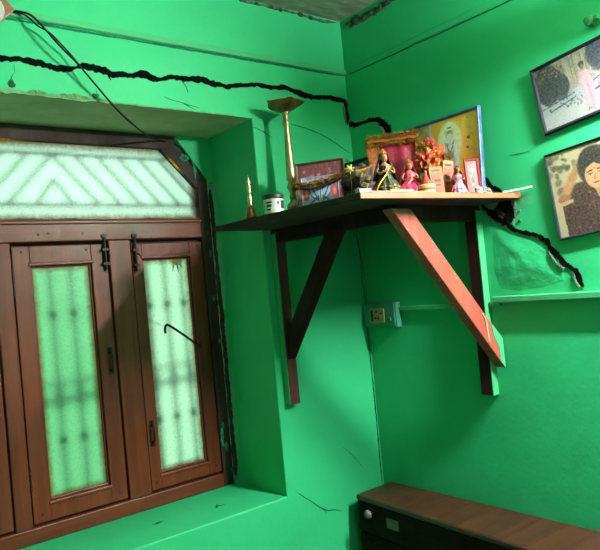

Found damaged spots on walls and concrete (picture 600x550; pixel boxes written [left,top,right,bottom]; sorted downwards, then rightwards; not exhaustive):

flaking render [239,0,336,23]
flaking render [344,0,396,28]
crack [0,55,392,137]
crack [485,176,503,193]
crack [506,224,584,287]